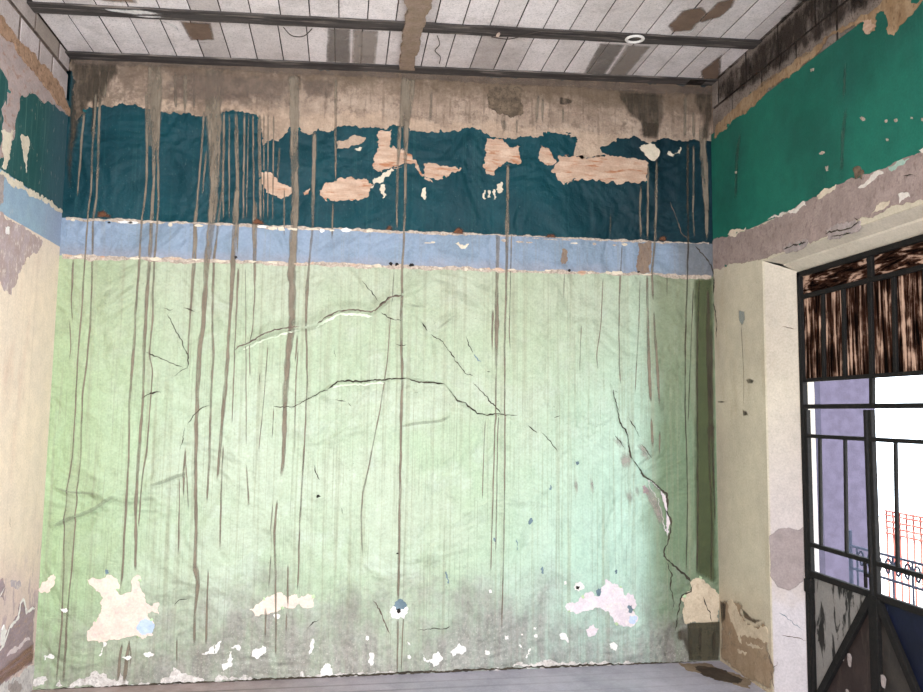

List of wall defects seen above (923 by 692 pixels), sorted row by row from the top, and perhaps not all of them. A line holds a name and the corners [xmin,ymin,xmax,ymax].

water stain [327,29,377,64]
water stain [668,0,734,32]
peeling [0,0,923,295]
water stain [69,57,726,653]
crack [274,282,558,450]
water stain [56,165,150,688]
crack [613,390,712,631]
peeling [87,570,159,656]
peeling [250,592,315,619]
peeling [564,570,638,627]
flaking render [681,576,719,624]
water stain [769,528,805,590]